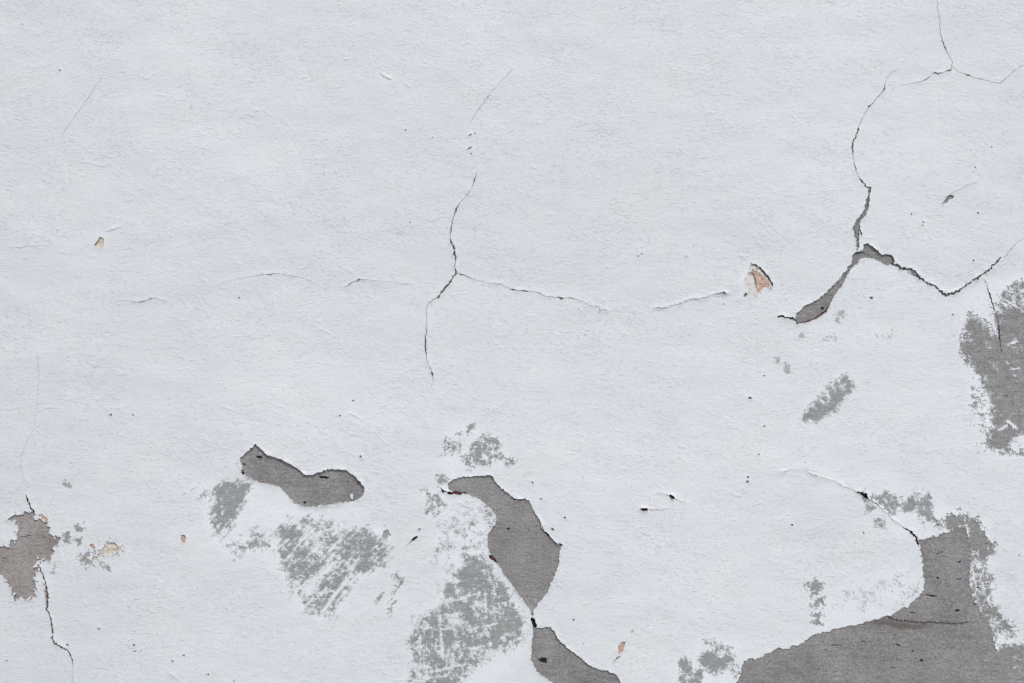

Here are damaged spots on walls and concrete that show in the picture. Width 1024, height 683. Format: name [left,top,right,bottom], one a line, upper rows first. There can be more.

crack [424,72,604,388]
peeling [743,263,773,300]
peeling [799,372,857,425]
crack [777,2,1023,352]
peeling [952,278,1024,457]
crack [38,564,74,679]
spalling [0,511,124,601]
peeling [183,444,405,621]
peeling [402,422,634,683]
spalling [677,488,1024,683]
crack [795,469,919,546]